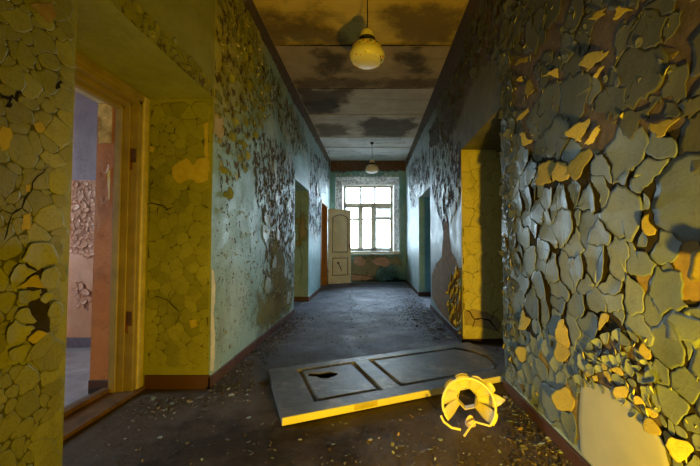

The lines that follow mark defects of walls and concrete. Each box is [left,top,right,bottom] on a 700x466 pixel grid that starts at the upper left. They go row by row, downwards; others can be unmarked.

crack [0,91,23,108]
water stain [262,5,462,114]
water stain [316,117,418,144]
crack [3,166,48,240]
peeling [0,0,110,466]
peeling [145,0,399,372]
peeling [406,0,700,466]